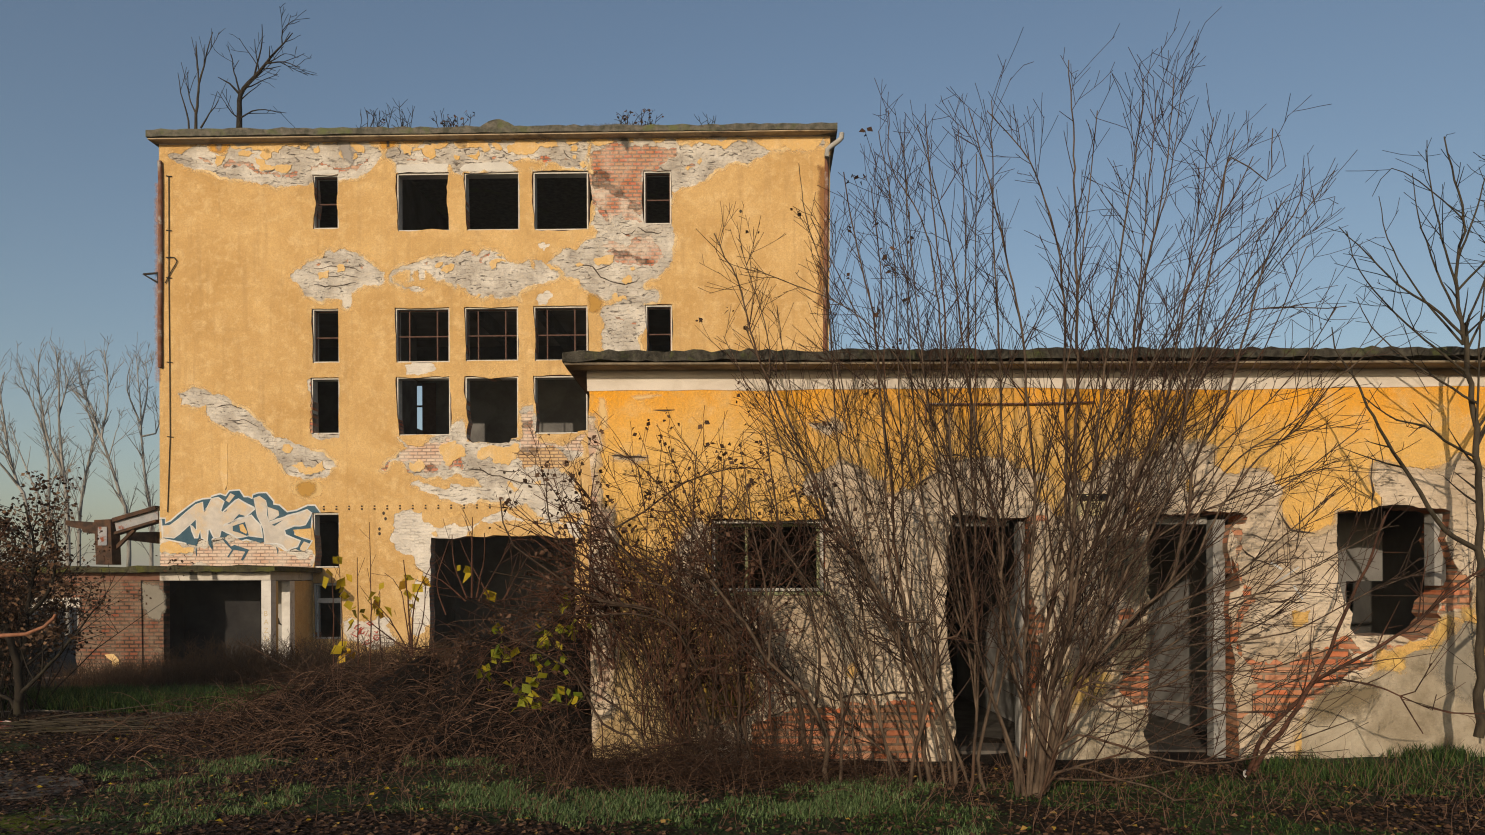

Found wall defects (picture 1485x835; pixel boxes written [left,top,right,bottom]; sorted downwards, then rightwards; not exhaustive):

peeling [168,136,825,351]
peeling [178,379,340,480]
peeling [809,417,845,435]
peeling [342,405,645,742]
peeling [672,436,1485,763]